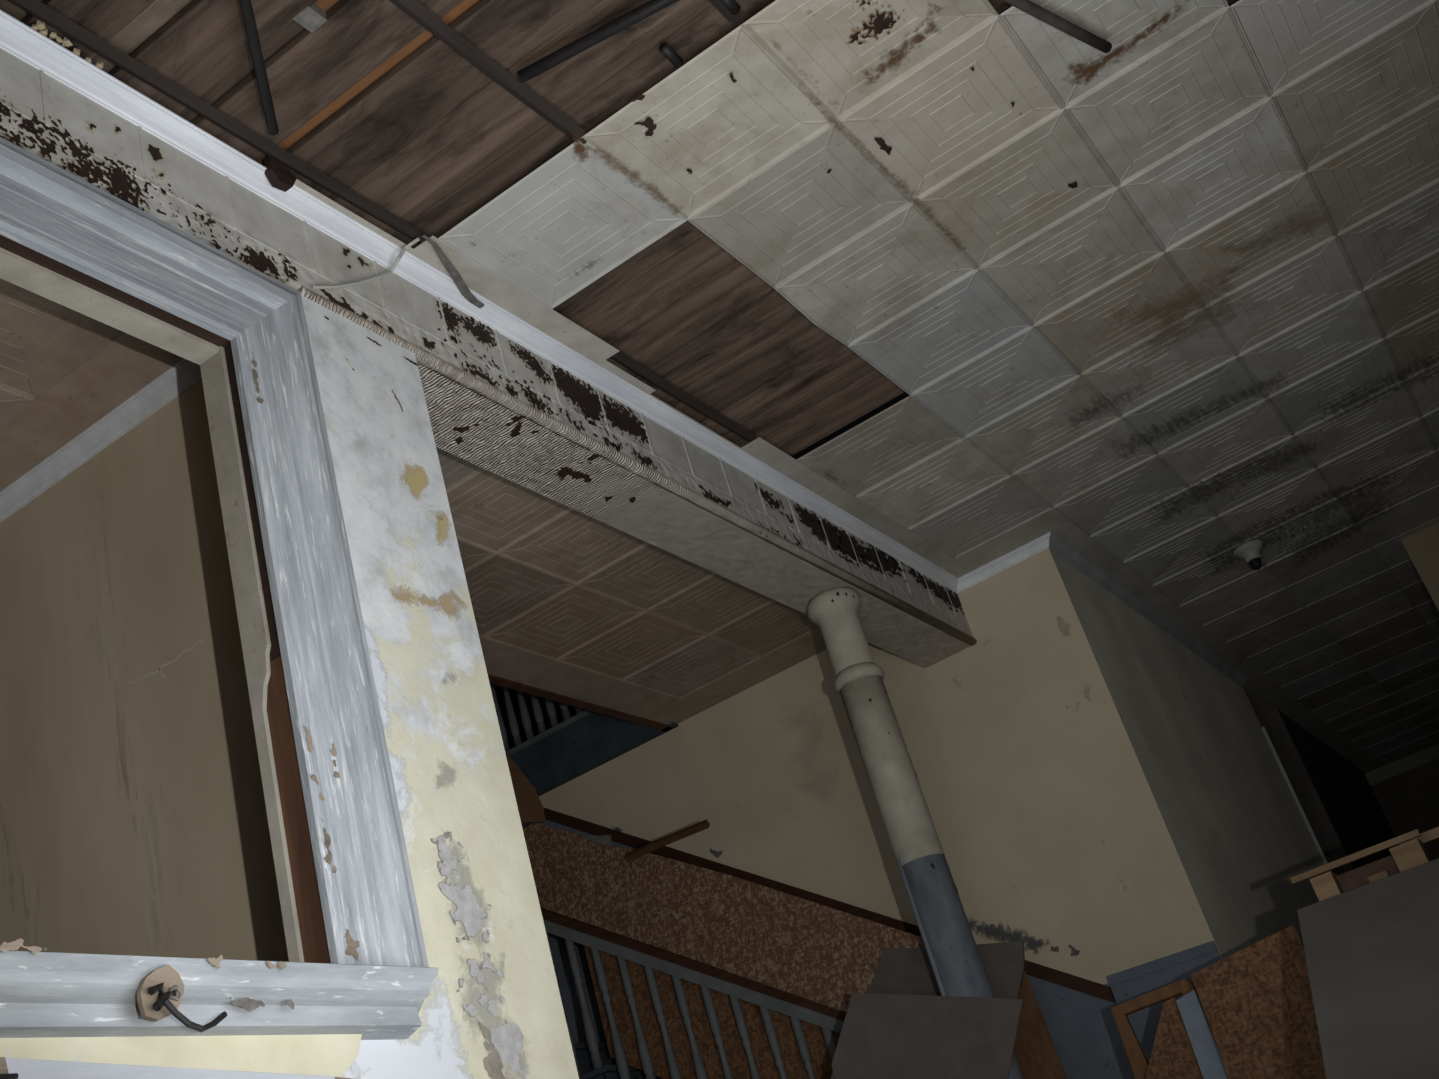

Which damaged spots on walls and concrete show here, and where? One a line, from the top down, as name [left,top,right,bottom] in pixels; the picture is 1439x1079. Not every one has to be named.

rust [848,0,940,83]
rust [1070,6,1181,84]
peeling [0,88,299,284]
peeling [341,245,373,272]
peeling [319,289,395,334]
peeling [252,352,264,403]
peeling [420,298,661,483]
peeling [698,484,732,511]
peeling [751,482,965,616]
peeling [304,726,313,753]
peeling [321,818,337,873]
peeling [342,831,530,1079]